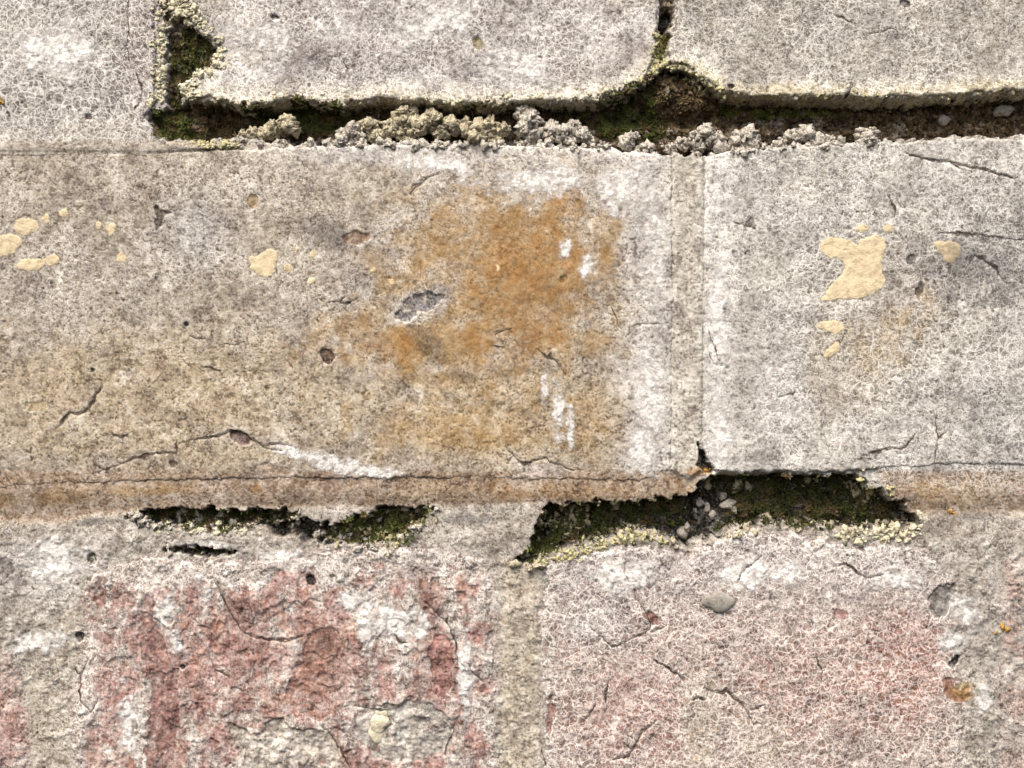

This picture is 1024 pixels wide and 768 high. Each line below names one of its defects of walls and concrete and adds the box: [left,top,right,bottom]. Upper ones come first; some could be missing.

crack [906,153,1013,178]
spalling [396,292,443,322]
crack [59,387,103,426]
crack [93,429,292,474]
spalling [524,463,565,477]
crack [868,411,946,463]